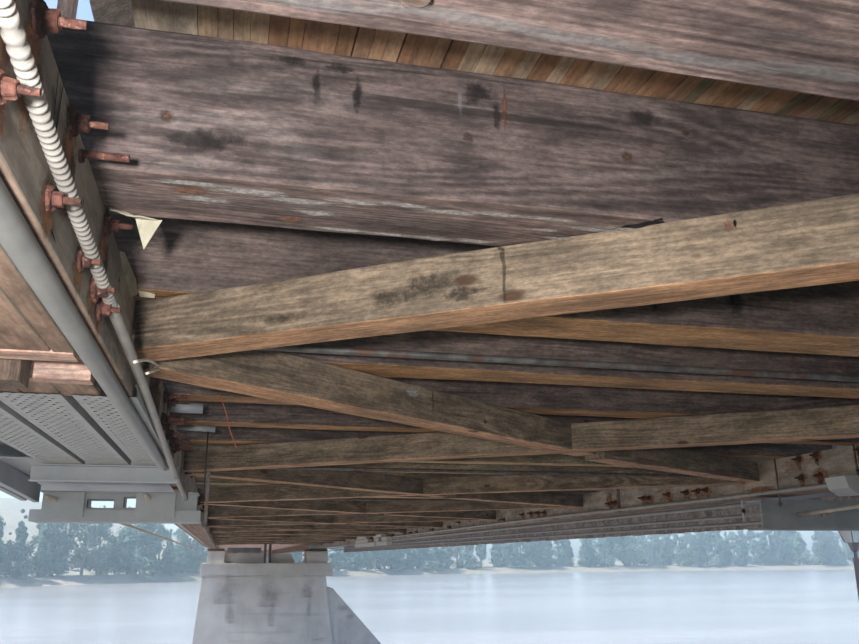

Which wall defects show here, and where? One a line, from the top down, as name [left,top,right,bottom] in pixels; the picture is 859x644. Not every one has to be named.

corrosion [0,27,10,75]
corrosion [25,5,43,80]
corrosion [0,95,34,137]
corrosion [62,104,77,177]
corrosion [39,173,66,240]
corrosion [73,246,102,334]
corrosion [100,212,109,273]
crack [498,247,506,298]